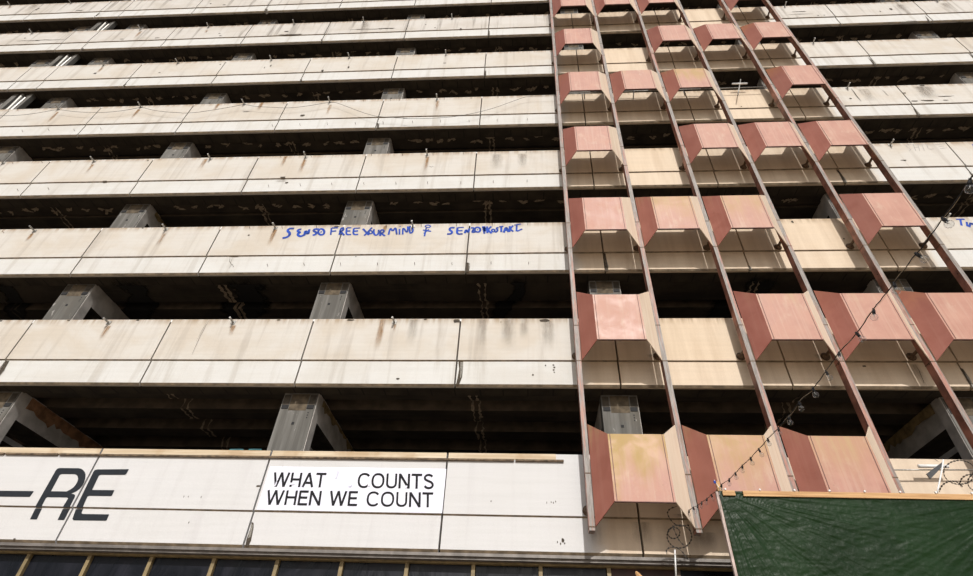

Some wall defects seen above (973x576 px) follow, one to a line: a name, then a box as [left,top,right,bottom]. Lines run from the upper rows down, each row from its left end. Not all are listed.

flaking render [25,398,105,449]